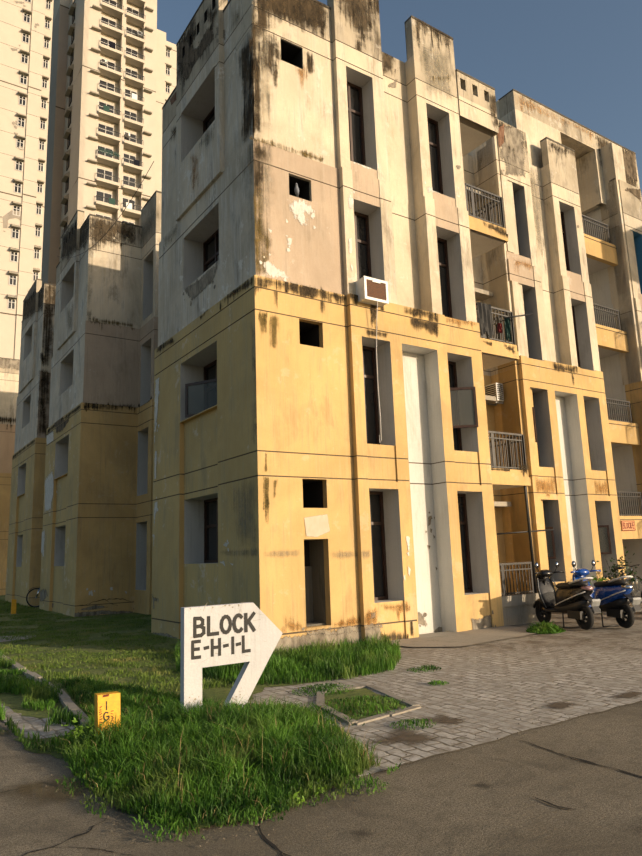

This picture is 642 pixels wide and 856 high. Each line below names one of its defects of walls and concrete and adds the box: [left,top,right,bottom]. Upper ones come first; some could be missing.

leakage [340,0,379,51]
leakage [176,18,196,82]
leakage [239,0,326,255]
peeling [286,199,316,229]
peeling [259,253,288,281]
leakage [220,278,358,311]
leakage [259,314,277,348]
leakage [406,308,438,336]
leakage [13,283,152,458]
crack [520,740,642,777]
crack [22,820,136,856]
crack [258,819,290,856]